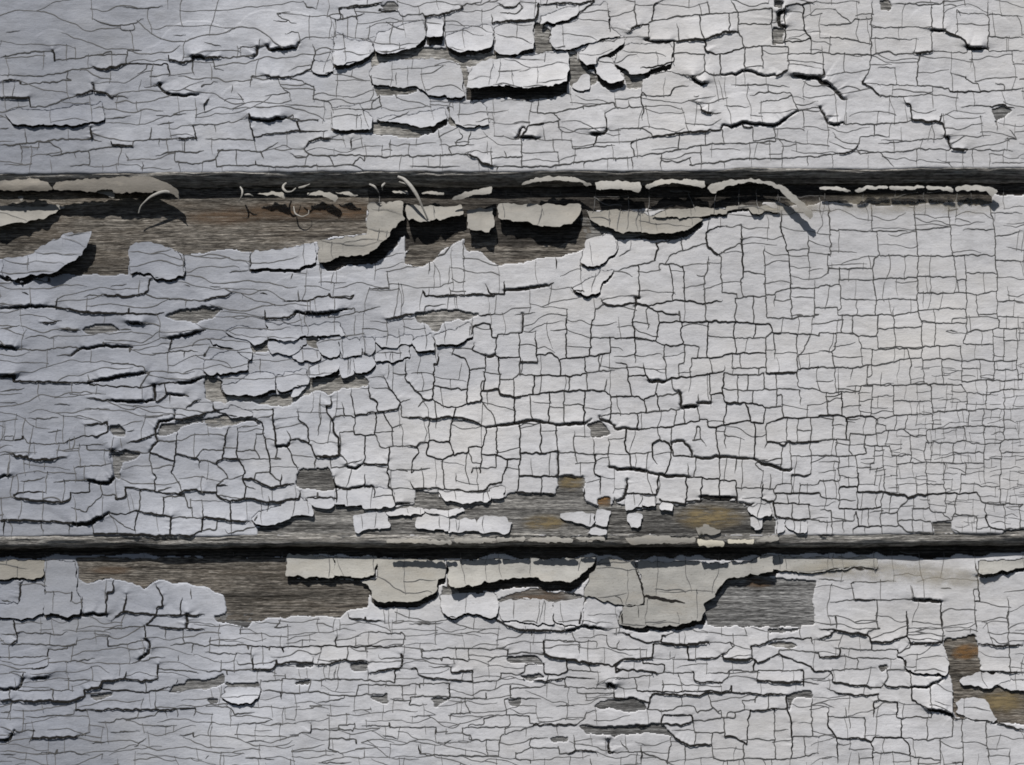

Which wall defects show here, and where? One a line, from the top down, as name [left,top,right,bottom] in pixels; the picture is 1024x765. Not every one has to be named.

peeling [312,2,673,138]
crack [0,0,1024,173]
peeling [0,187,779,296]
crack [0,186,1024,765]
peeling [252,476,808,537]
peeling [0,553,878,628]
peeling [979,558,1024,574]
peeling [898,634,1024,725]